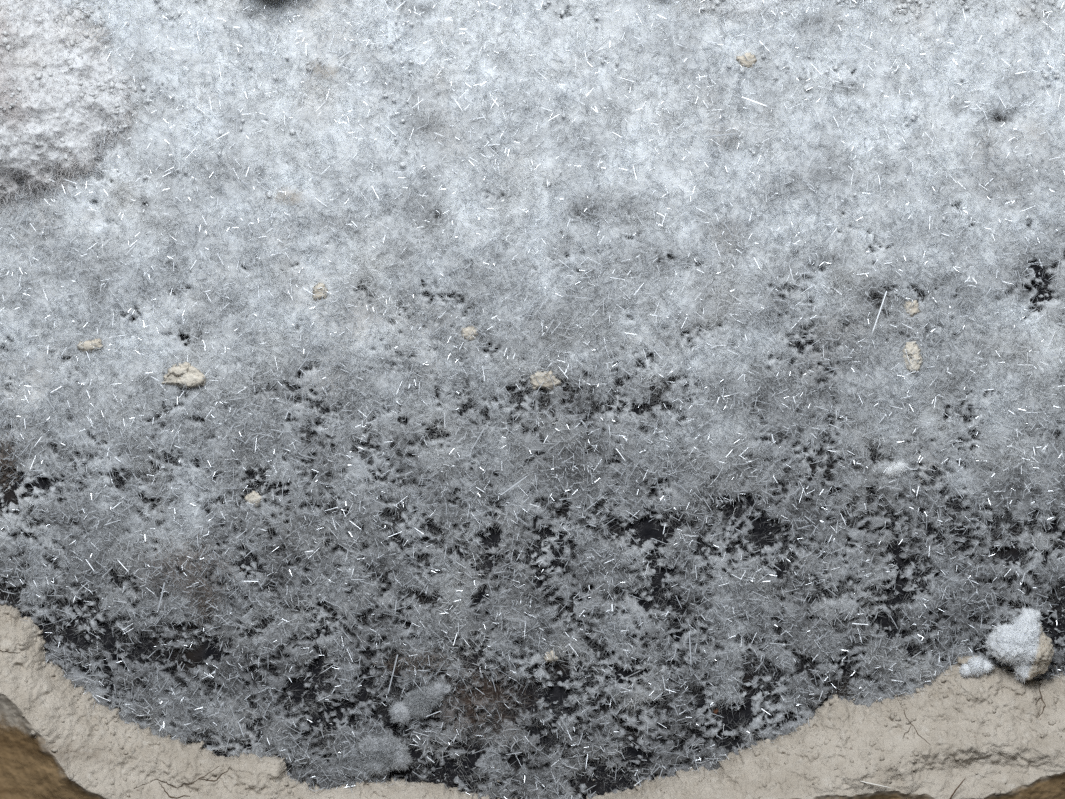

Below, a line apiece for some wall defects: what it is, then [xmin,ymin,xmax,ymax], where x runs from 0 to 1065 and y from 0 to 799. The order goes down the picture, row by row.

spalling [736,52,757,68]
spalling [312,282,328,301]
spalling [77,338,103,353]
spalling [903,341,923,374]
spalling [162,362,206,388]
spalling [529,371,561,390]
spalling [244,491,262,508]
spalling [544,650,558,663]
damp [1033,628,1065,681]
spalling [0,604,517,799]
spalling [586,655,1065,799]